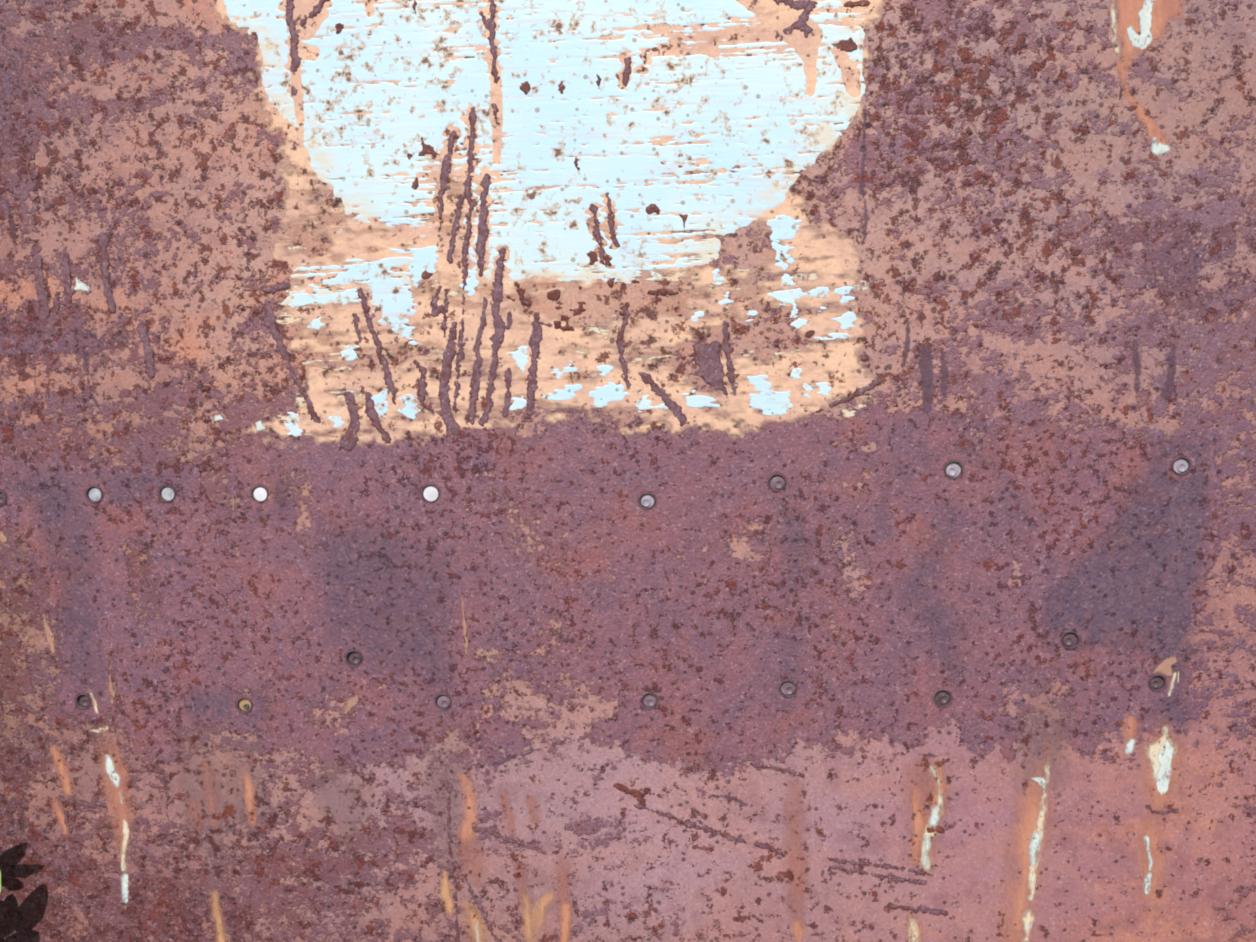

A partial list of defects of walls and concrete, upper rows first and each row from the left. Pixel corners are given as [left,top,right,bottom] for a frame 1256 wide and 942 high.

rust [843,0,870,8]
rust [835,37,858,52]
peeling [1111,0,1181,155]
rust [407,137,441,160]
peeling [215,0,883,447]
rust [646,204,660,214]
rust [587,251,612,267]
rust [506,282,525,301]
rust [1096,211,1256,351]
rust [0,320,130,362]
rust [692,341,728,396]
rust [0,401,1223,942]